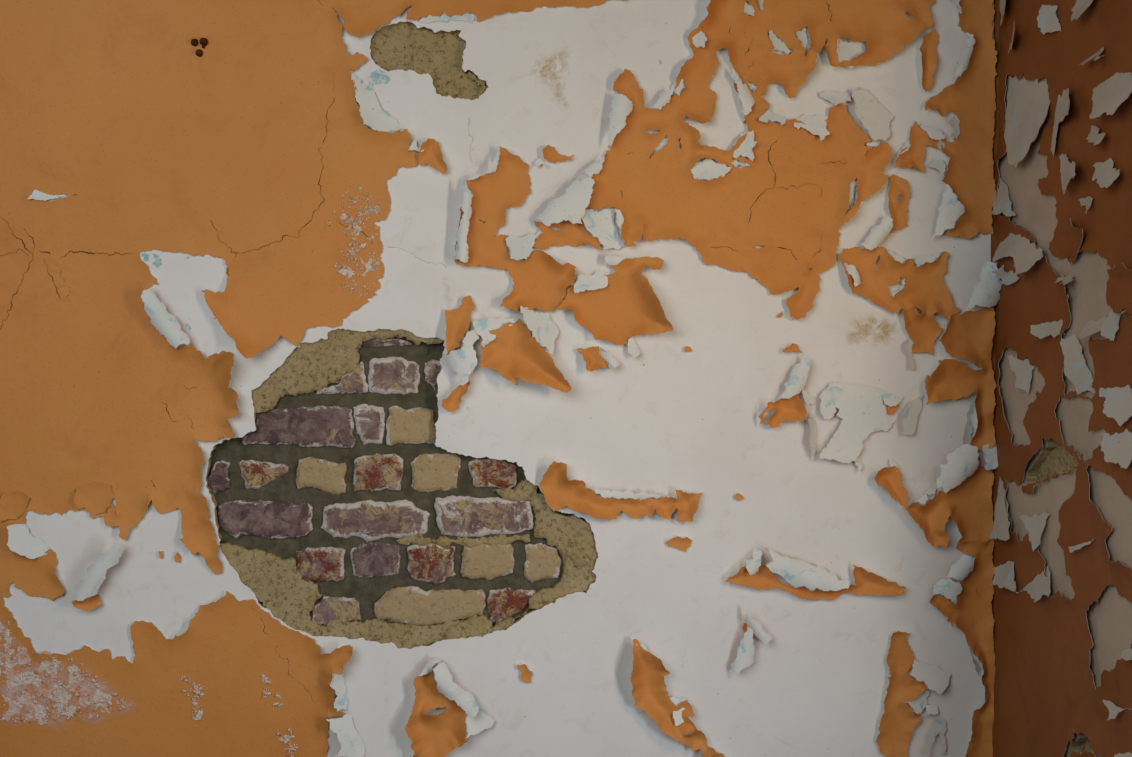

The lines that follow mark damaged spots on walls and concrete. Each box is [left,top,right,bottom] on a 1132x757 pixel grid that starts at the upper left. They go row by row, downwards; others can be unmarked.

peeling [27,189,69,201]
crack [0,212,135,331]
peeling [1002,107,1112,380]
peeling [139,0,1002,757]
peeling [1003,349,1045,445]
flaking render [3,328,598,663]
peeling [1008,381,1111,598]
peeling [1093,470,1132,564]
damp [0,617,132,725]
peeling [1093,585,1132,686]